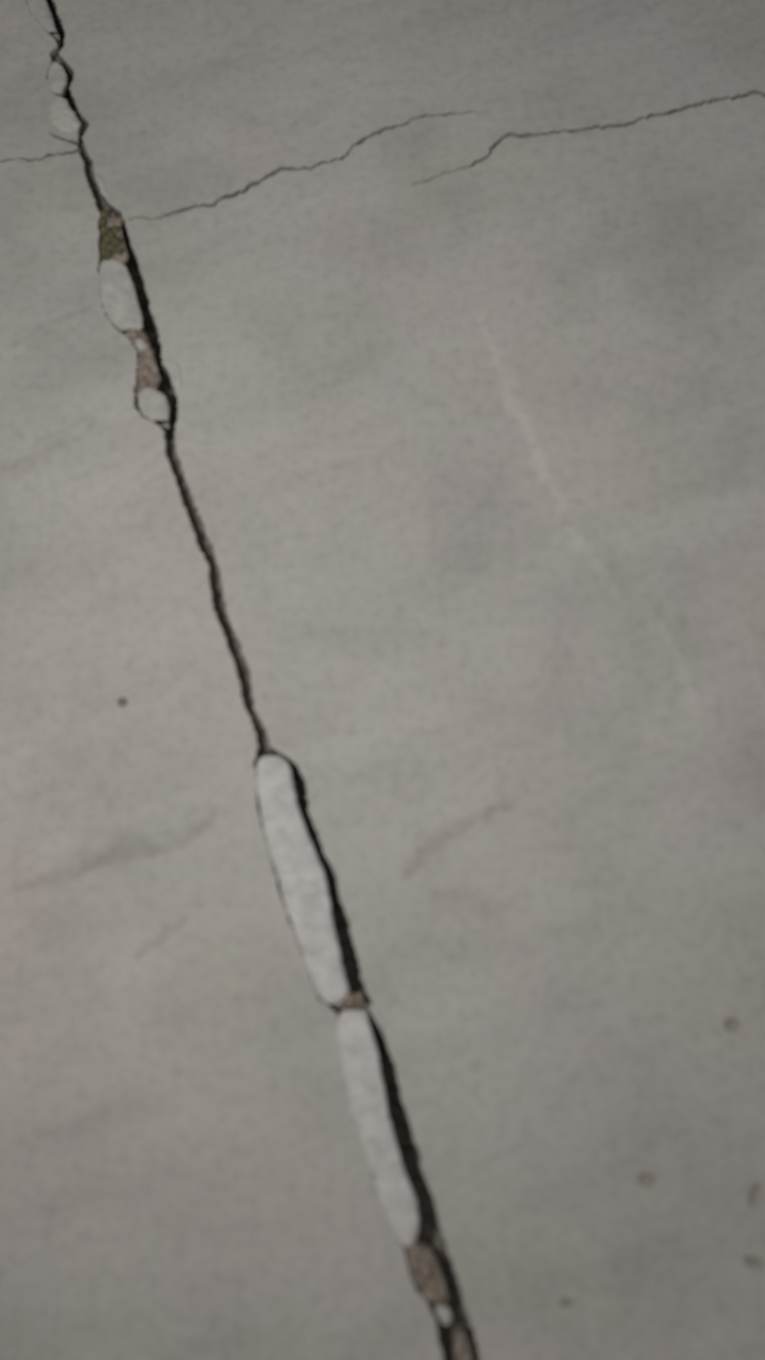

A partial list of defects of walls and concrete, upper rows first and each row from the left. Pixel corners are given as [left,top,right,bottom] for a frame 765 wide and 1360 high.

crack [0,0,483,1360]